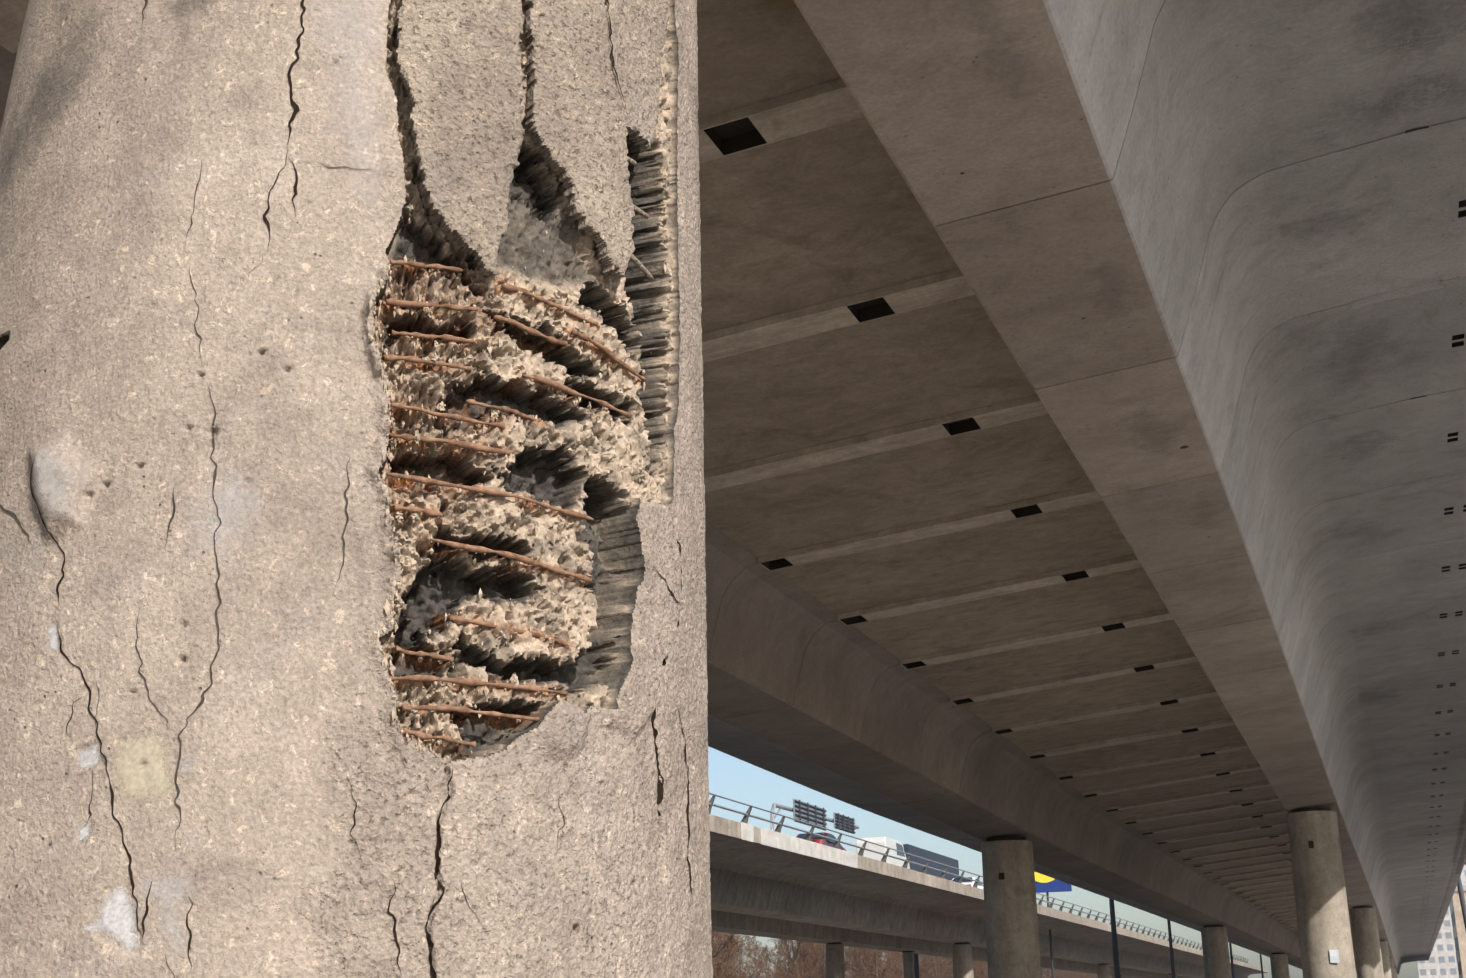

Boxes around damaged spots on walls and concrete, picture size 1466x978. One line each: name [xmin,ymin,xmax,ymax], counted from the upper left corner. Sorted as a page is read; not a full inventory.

crack [242,0,375,292]
crack [606,0,630,120]
crack [135,161,222,849]
spalling [368,0,681,771]
crack [0,454,193,978]
crack [387,769,484,978]
crack [651,541,693,903]